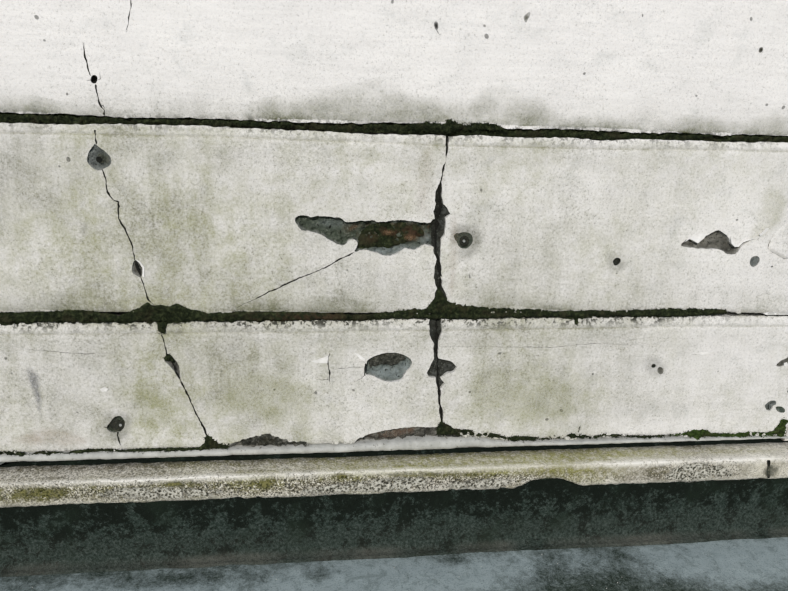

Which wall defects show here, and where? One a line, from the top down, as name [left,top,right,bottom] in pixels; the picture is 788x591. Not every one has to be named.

crack [83,46,105,144]
spalling [88,144,112,170]
crack [102,169,135,260]
crack [237,252,354,308]
spalling [295,215,436,255]
crack [431,137,450,299]
spalling [681,228,769,254]
crack [161,335,207,435]
spalling [364,353,412,381]
crack [427,319,461,437]